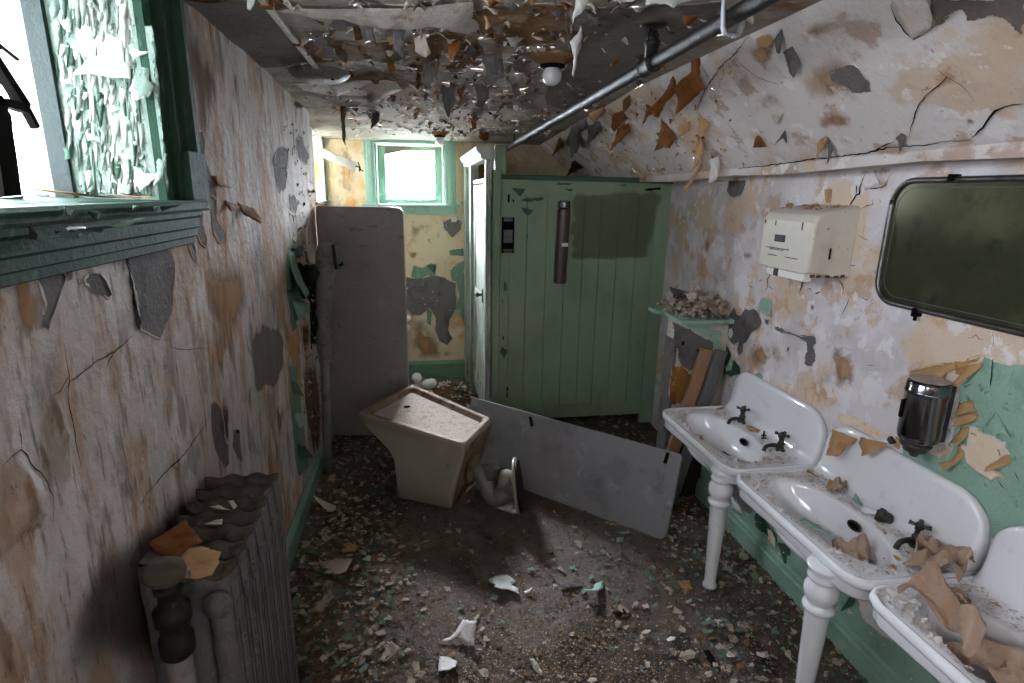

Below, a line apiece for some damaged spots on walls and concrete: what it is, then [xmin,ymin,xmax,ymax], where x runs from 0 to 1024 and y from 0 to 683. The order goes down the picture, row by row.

peeling [0,0,178,240]
crack [739,70,1020,240]
peeling [247,0,787,476]
flaking render [36,272,113,330]
flaking render [126,249,176,341]
flaking render [721,297,816,381]
crack [2,426,54,516]
crack [54,336,132,471]
crack [140,414,210,505]
flaking render [209,401,243,468]
peeling [826,414,900,456]
peeling [909,355,1016,486]